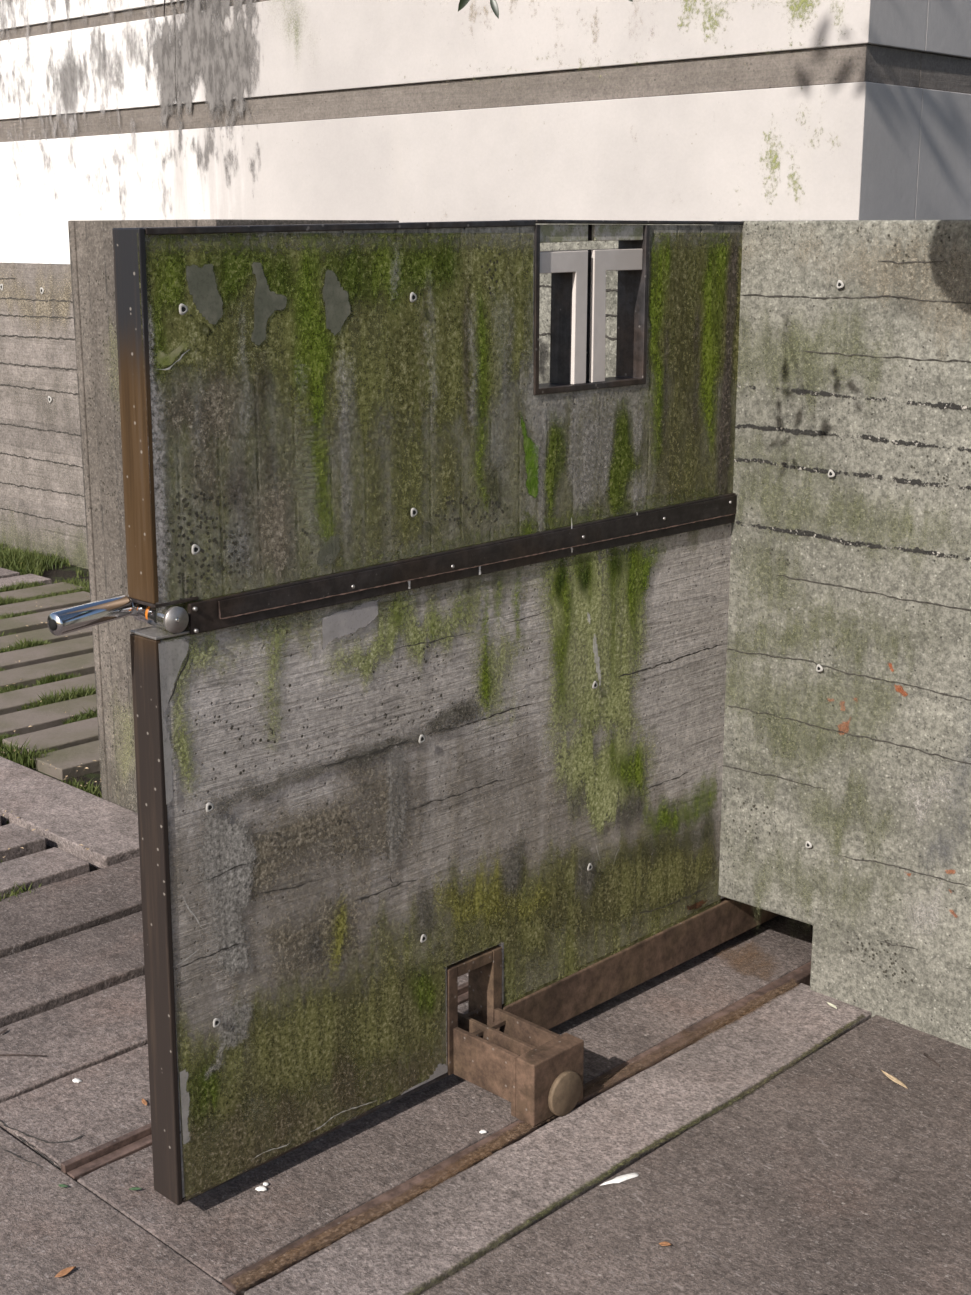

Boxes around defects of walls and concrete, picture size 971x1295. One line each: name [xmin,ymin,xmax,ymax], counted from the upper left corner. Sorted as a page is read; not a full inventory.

peeling [186,264,223,325]
peeling [251,262,287,345]
peeling [322,269,351,336]
damp [609,549,658,626]
damp [587,612,601,686]
damp [215,699,479,895]
damp [263,899,359,977]
damp [184,1050,438,1201]